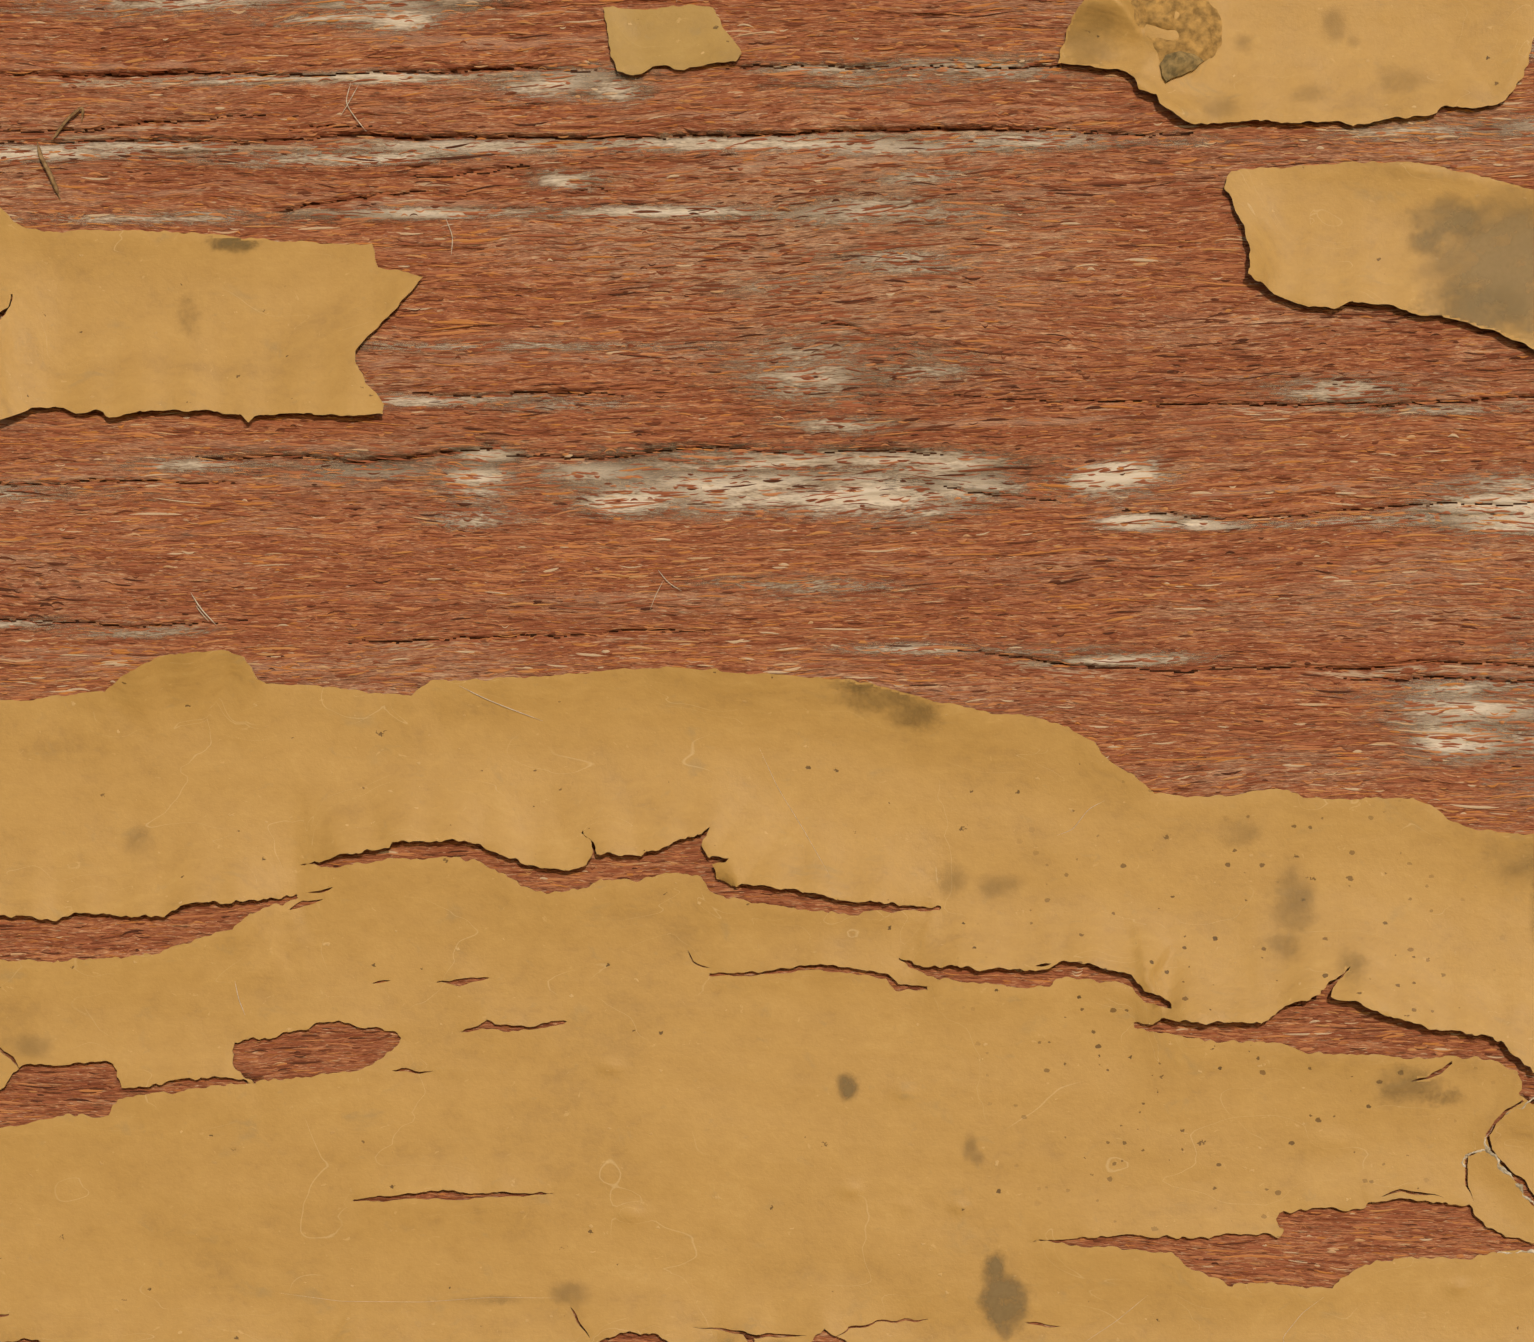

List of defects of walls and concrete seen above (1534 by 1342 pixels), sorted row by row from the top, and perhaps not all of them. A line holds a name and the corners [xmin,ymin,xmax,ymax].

peeling [603,4,742,75]
peeling [1058,0,1534,126]
peeling [0,207,423,422]
peeling [1224,161,1534,349]
peeling [0,650,1534,1342]
crack [353,1190,553,1202]
crack [688,951,1534,1288]